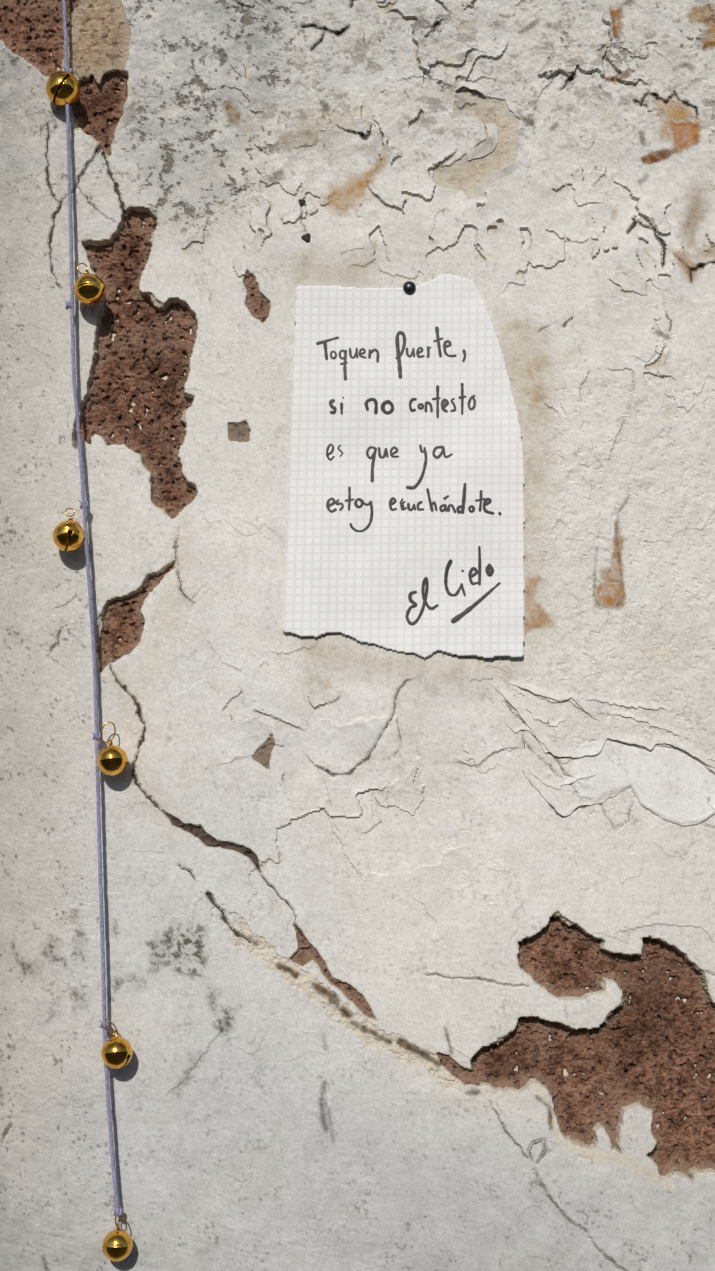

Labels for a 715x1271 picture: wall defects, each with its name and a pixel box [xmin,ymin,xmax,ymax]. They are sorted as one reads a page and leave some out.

spalling [0,0,80,77]
spalling [72,71,129,156]
corrosion [642,102,699,163]
spalling [75,210,197,518]
spalling [97,565,174,673]
crack [109,664,161,811]
crack [316,683,405,776]
crack [178,865,252,943]
crack [259,872,302,935]
spalling [291,925,375,1018]
spalling [438,917,715,1176]
crack [491,1104,625,1271]